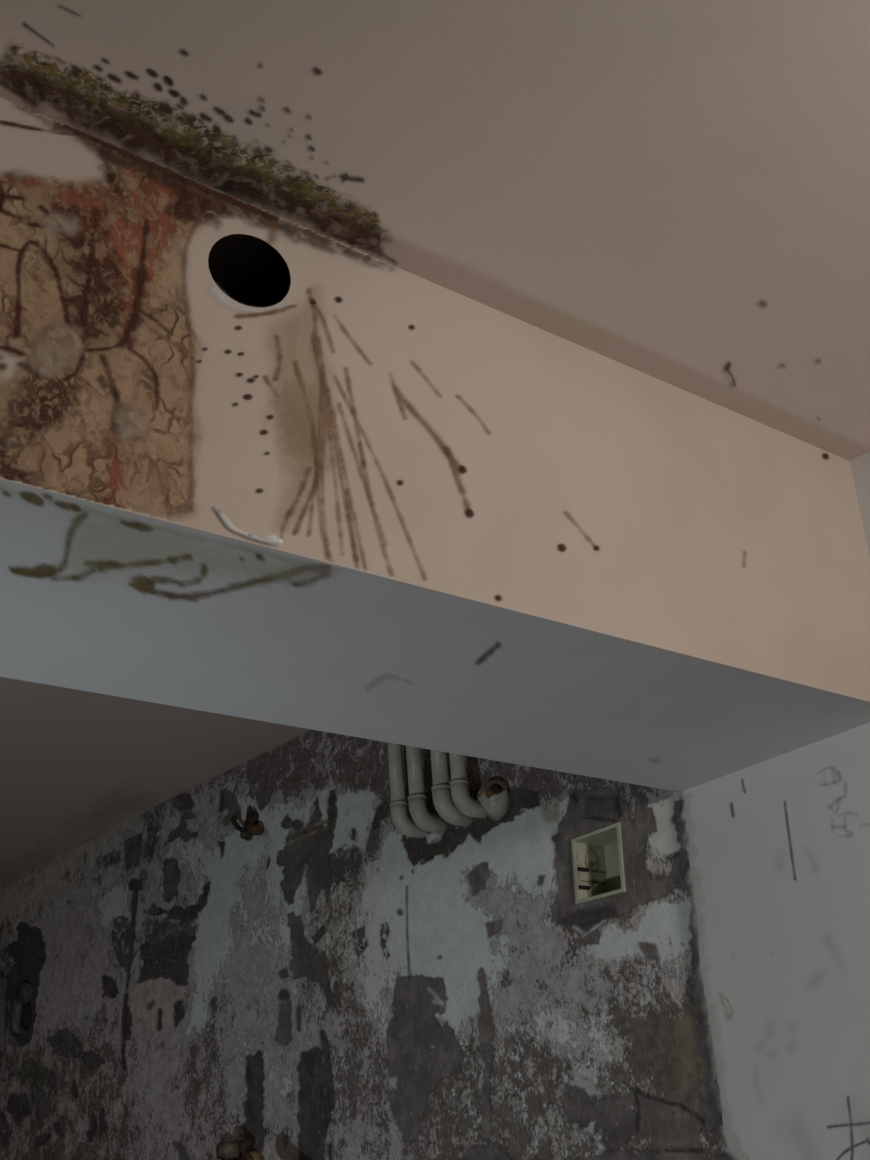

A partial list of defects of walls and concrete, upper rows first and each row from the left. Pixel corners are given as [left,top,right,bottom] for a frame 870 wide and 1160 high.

crack [0,121,42,130]
crack [0,183,149,440]
water stain [0,46,395,600]
water stain [396,390,474,517]
peeling [102,794,210,998]
peeling [254,787,362,1045]
peeling [352,923,390,960]
peeling [401,787,540,872]
peeling [468,862,490,896]
peeling [538,787,723,1132]
peeling [386,975,463,1142]
peeling [477,967,495,1140]